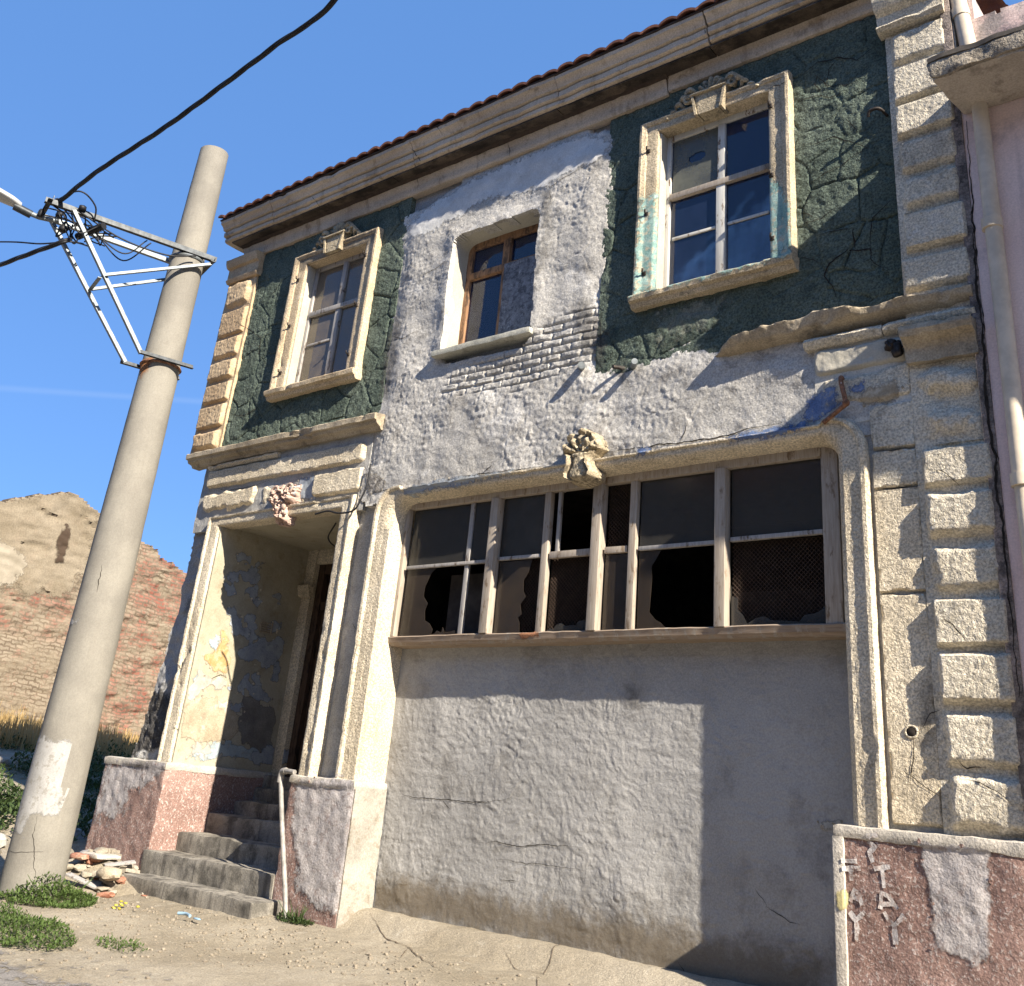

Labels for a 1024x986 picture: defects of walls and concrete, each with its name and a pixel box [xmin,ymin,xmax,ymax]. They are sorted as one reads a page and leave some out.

crack [771,43,878,103]
crack [800,119,877,185]
peeling [628,178,792,299]
crack [793,202,889,305]
peeling [403,469,513,498]
spalling [182,566,289,765]
crack [901,710,945,799]
crack [397,786,511,808]
crack [474,841,579,887]